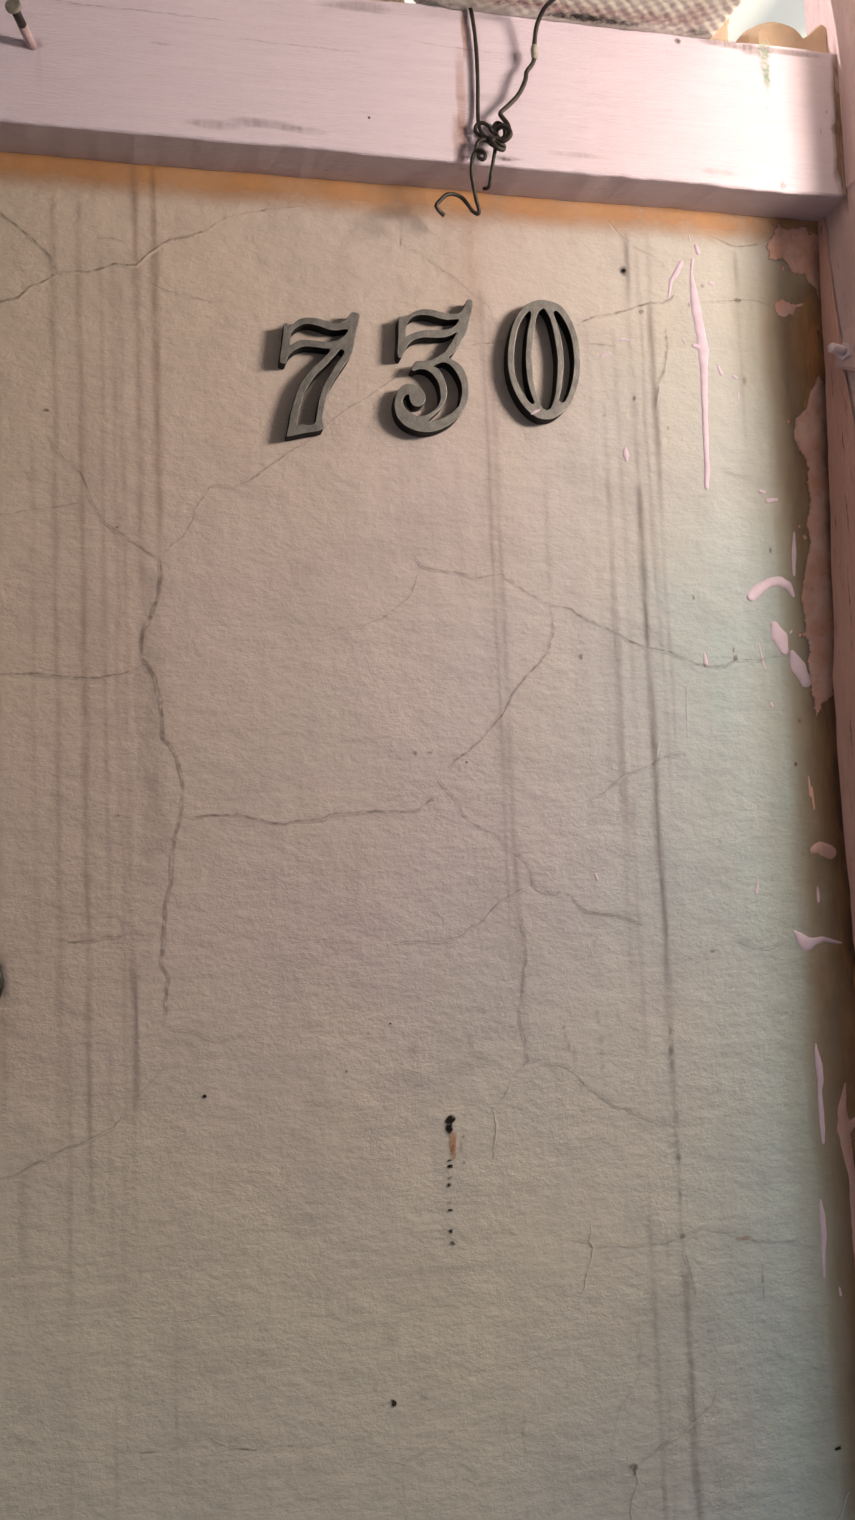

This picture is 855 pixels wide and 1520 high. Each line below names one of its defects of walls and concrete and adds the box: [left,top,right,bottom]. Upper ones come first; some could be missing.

peeling [767,224,821,317]
peeling [787,374,834,716]
crack [0,555,792,1161]
crack [563,1216,820,1304]